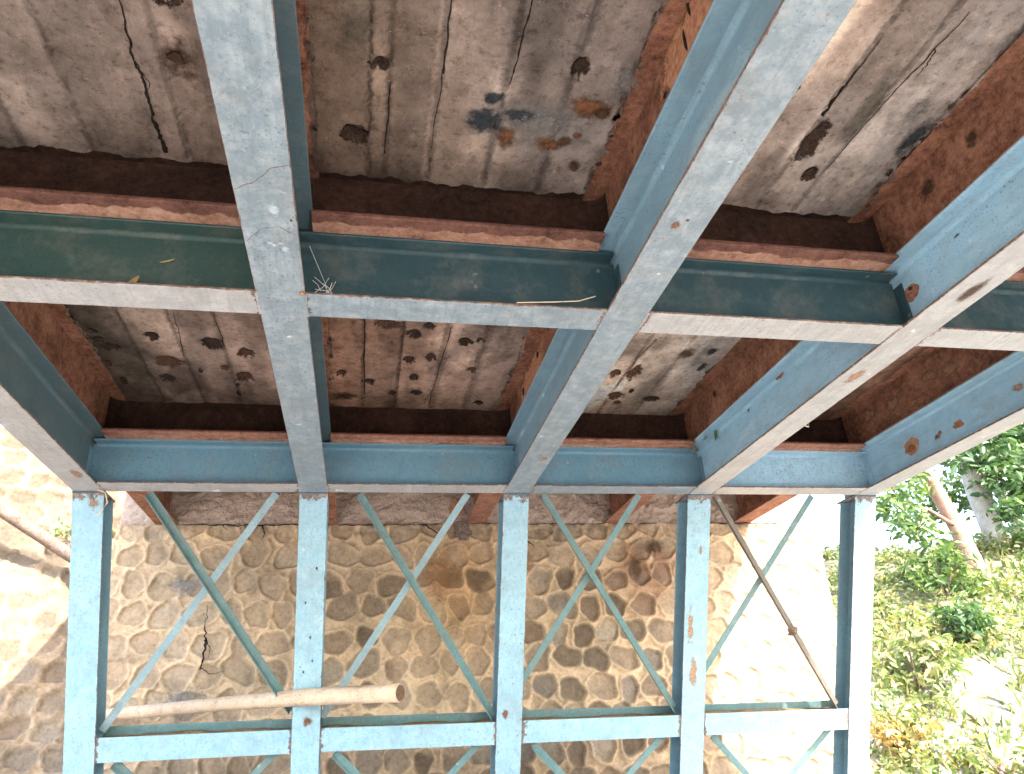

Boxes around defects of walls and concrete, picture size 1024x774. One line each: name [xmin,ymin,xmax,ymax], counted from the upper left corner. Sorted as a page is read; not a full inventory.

crack [119,0,168,153]
crack [429,0,452,167]
leakage [466,93,534,133]
spalling [571,57,591,80]
corrosion [573,97,612,118]
crack [821,12,970,170]
spalling [339,124,368,144]
corrosion [537,133,581,150]
spalling [791,118,833,182]
spalling [199,337,223,350]
corrosion [904,437,919,456]
crack [199,605,222,674]